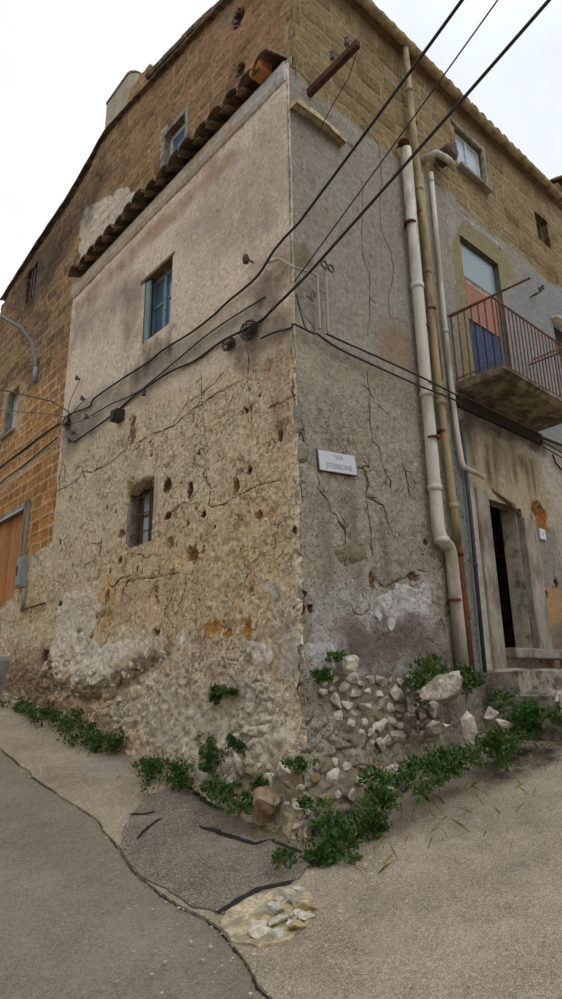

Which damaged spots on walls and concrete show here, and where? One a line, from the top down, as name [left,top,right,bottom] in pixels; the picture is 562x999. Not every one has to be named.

spalling [127,412,138,452]
crack [57,342,414,554]
spalling [164,472,173,496]
spalling [187,481,206,527]
spalling [231,467,252,495]
rust [531,508,547,531]
crack [83,532,188,607]
spalling [167,531,204,574]
crack [349,570,426,615]
peeling [369,569,433,631]
peeling [42,586,274,690]